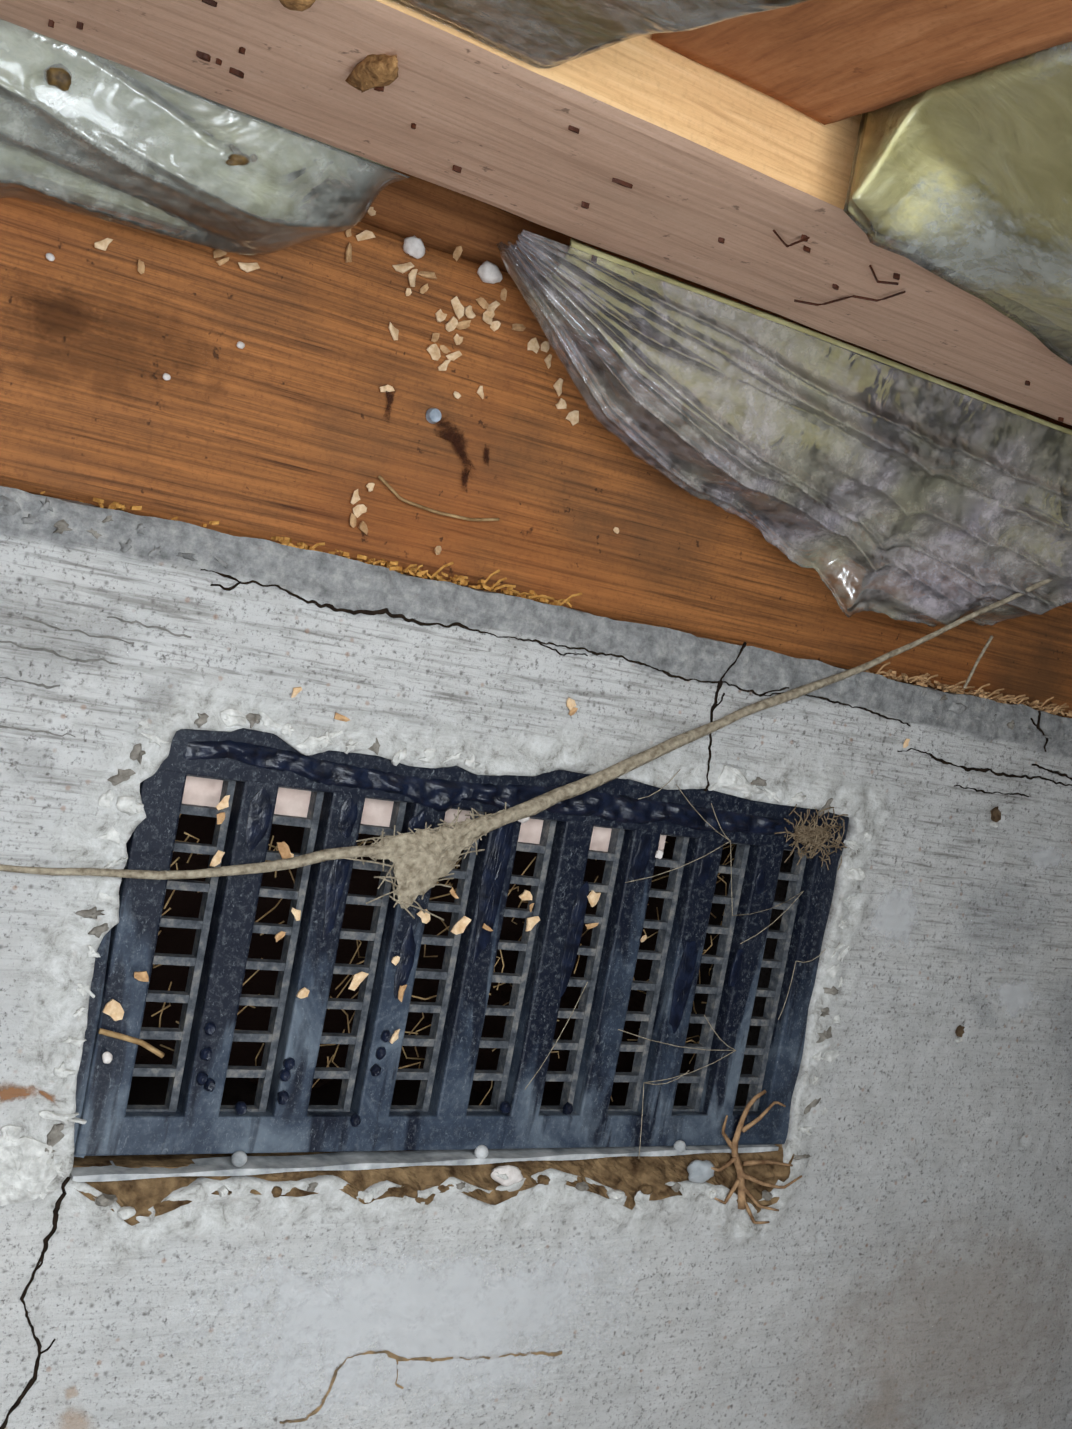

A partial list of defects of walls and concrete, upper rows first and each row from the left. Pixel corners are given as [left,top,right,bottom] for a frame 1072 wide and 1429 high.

crack [201,569,1072,797]
crack [0,1176,71,1429]